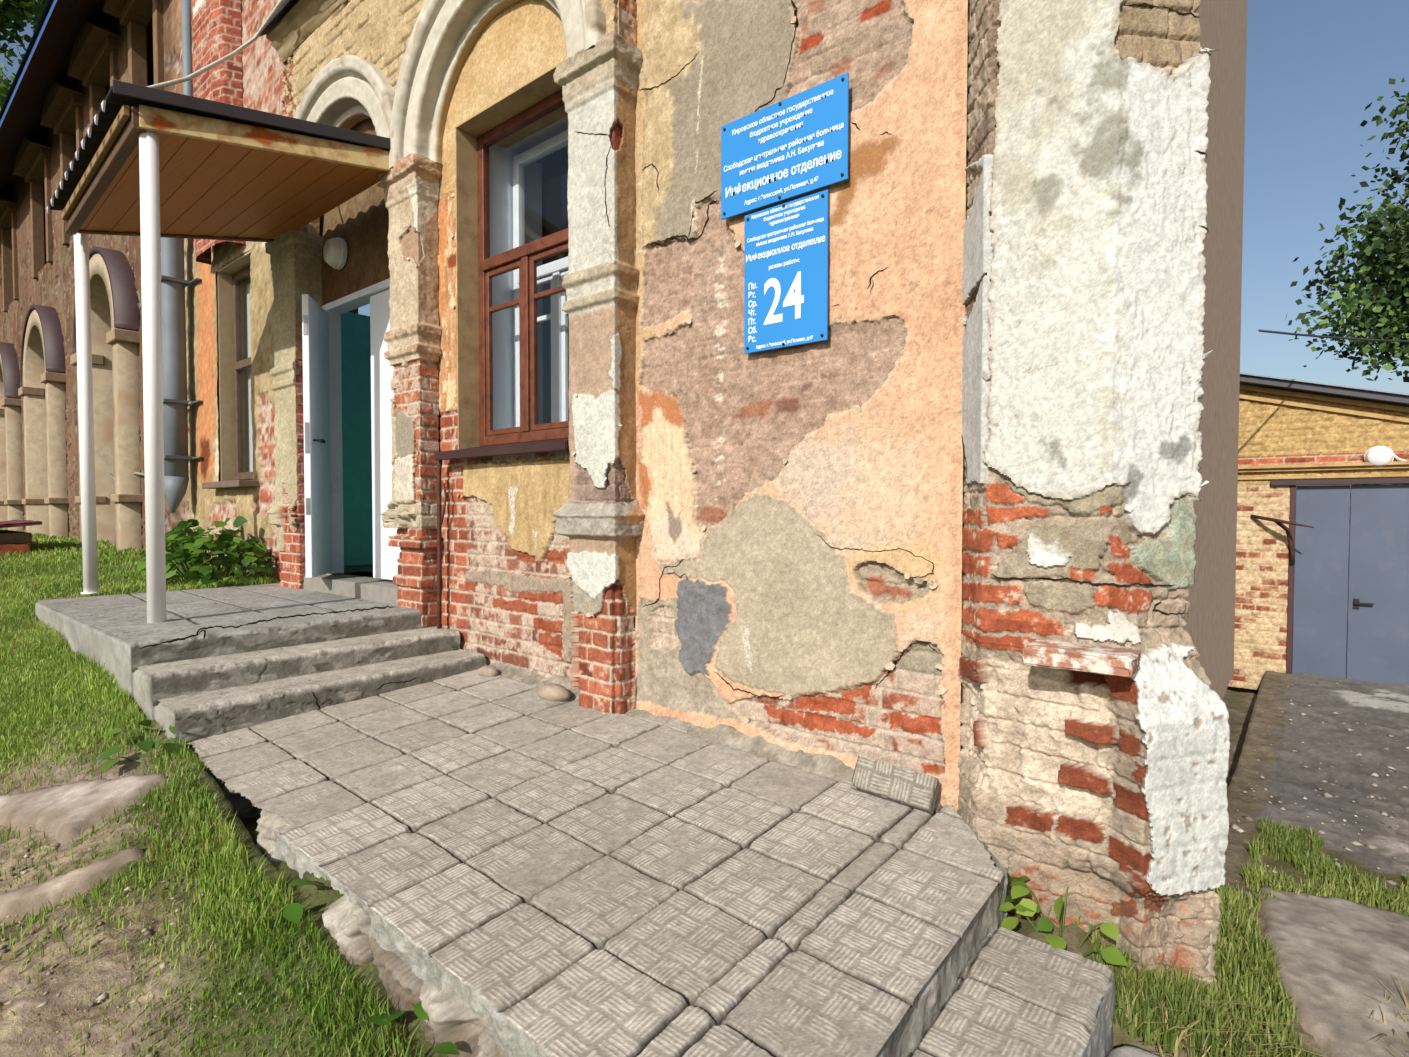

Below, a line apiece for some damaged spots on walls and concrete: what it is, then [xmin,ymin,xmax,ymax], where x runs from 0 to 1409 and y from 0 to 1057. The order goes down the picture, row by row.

peeling [613,0,637,48]
flaking render [787,0,914,113]
flaking render [1114,0,1218,68]
flaking render [639,198,908,531]
flaking render [388,189,680,715]
crack [138,606,393,649]
flaking render [728,464,1221,990]